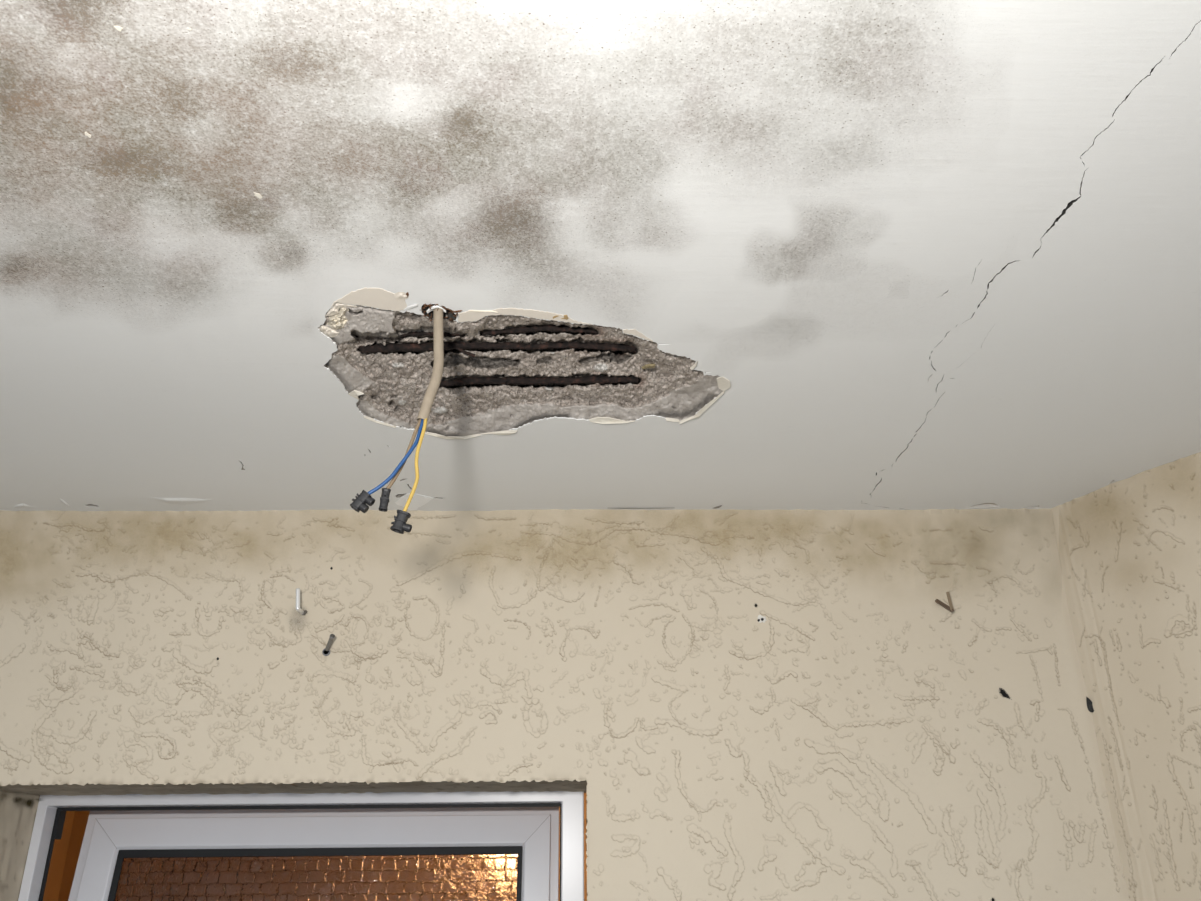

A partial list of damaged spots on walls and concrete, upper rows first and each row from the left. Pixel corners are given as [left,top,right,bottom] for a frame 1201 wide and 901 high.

mould [0,0,961,313]
spalling [318,287,731,439]
crack [866,20,1201,510]